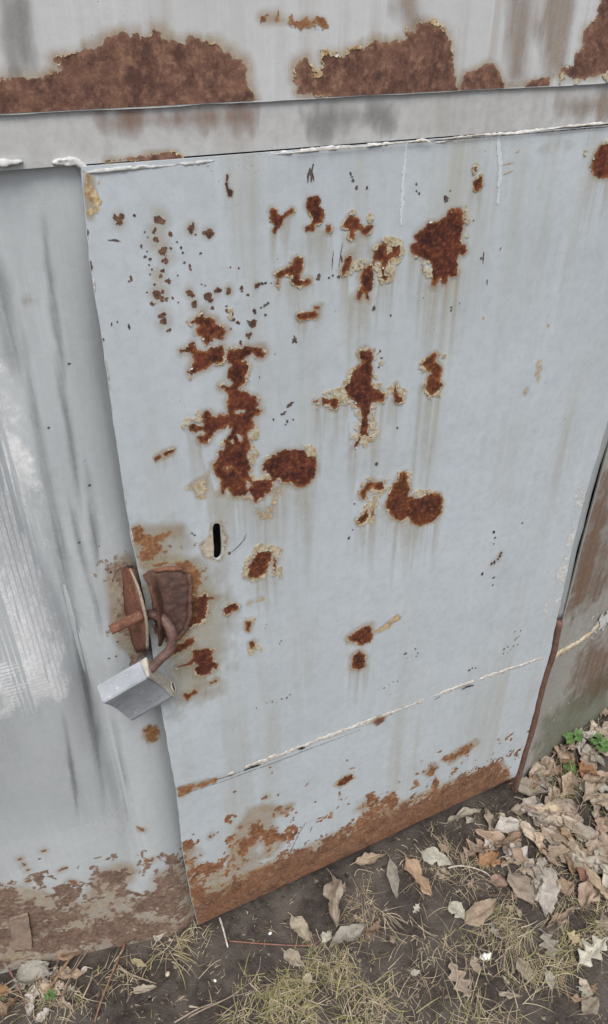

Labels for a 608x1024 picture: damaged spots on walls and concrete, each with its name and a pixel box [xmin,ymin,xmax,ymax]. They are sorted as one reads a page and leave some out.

corrosion [0,28,256,129]
corrosion [293,18,504,97]
corrosion [525,0,608,87]
corrosion [584,139,608,179]
corrosion [269,195,470,300]
corrosion [180,308,318,507]
corrosion [313,348,408,449]
corrosion [419,352,446,399]
corrosion [356,471,446,527]
corrosion [94,524,263,685]
corrosion [347,625,374,671]
corrosion [0,732,523,972]